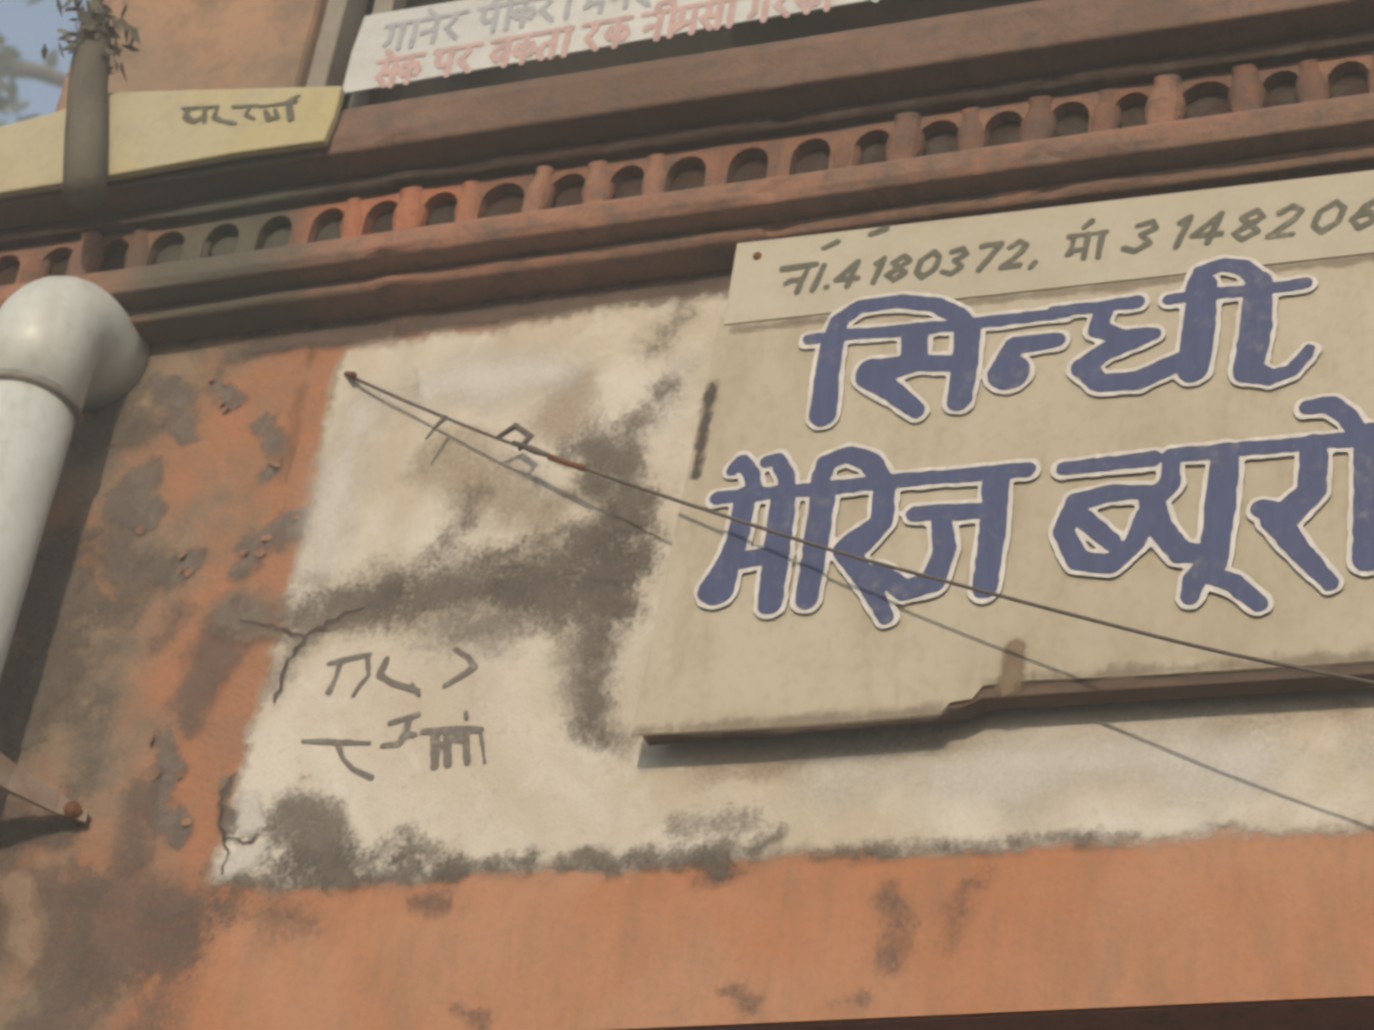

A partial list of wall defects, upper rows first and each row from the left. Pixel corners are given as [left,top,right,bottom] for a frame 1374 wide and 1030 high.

damp [691,382,717,479]
damp [275,354,679,743]
damp [0,522,171,801]
damp [176,592,271,734]
crack [240,607,365,703]
damp [231,777,538,889]
damp [554,829,782,878]
damp [809,831,1092,859]